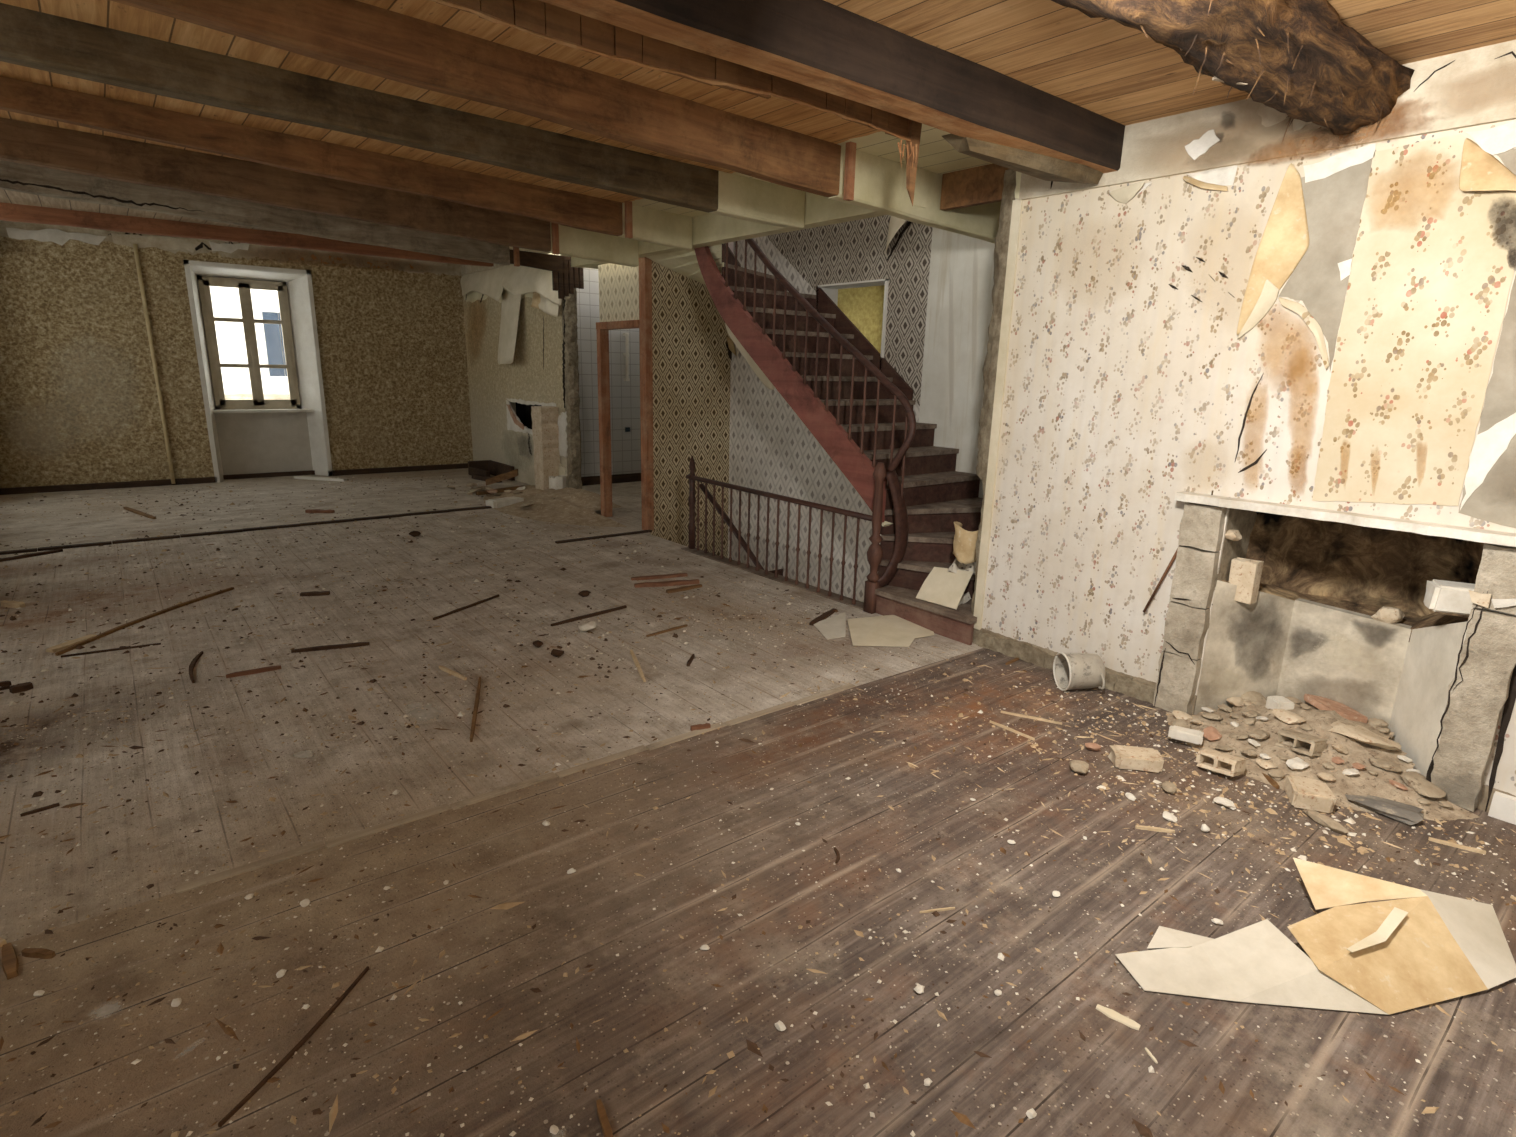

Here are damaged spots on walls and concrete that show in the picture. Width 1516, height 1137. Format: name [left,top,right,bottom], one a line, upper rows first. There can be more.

crack [0,179,204,212]
flaking render [1185,129,1220,160]
flaking render [1257,106,1312,131]
flaking render [1278,150,1376,370]
crack [1415,60,1455,90]
water stain [1494,203,1516,268]
flaking render [1496,148,1516,175]
flaking render [1478,275,1516,434]
flaking render [1458,434,1516,528]
spalling [1246,511,1516,618]
crack [1426,592,1488,782]
crack [1485,665,1516,812]